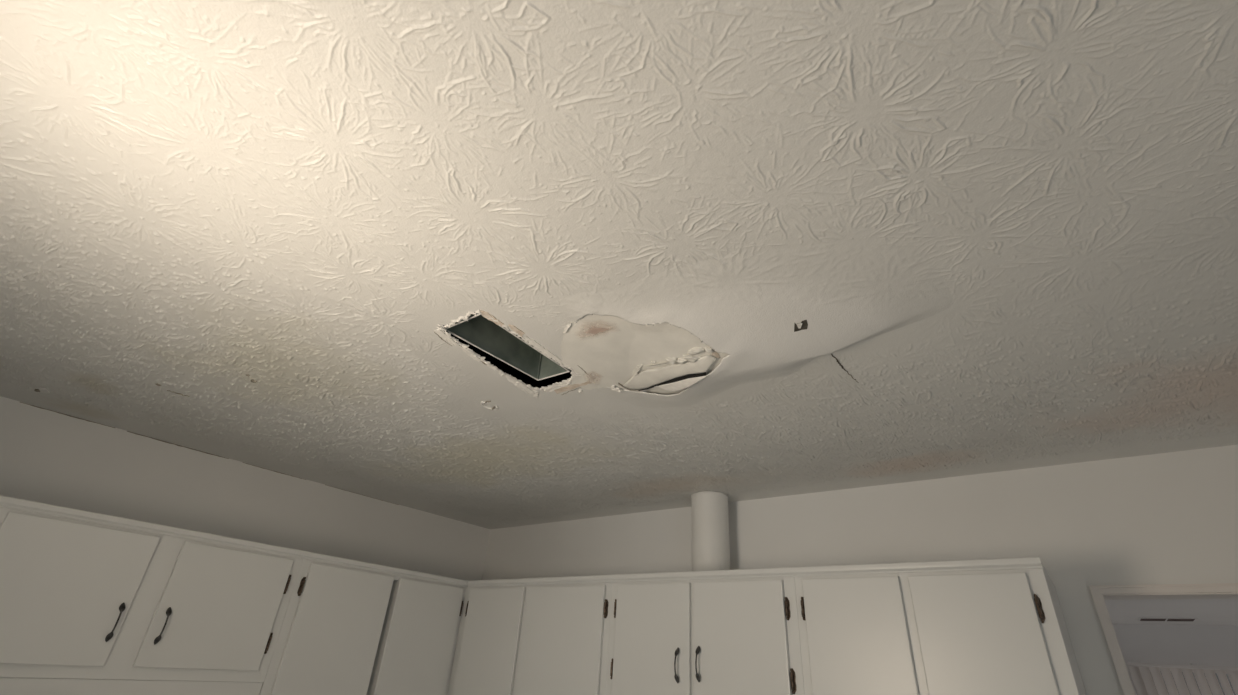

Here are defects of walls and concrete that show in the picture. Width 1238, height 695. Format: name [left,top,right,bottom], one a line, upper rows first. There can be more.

peeling [434,310,728,398]